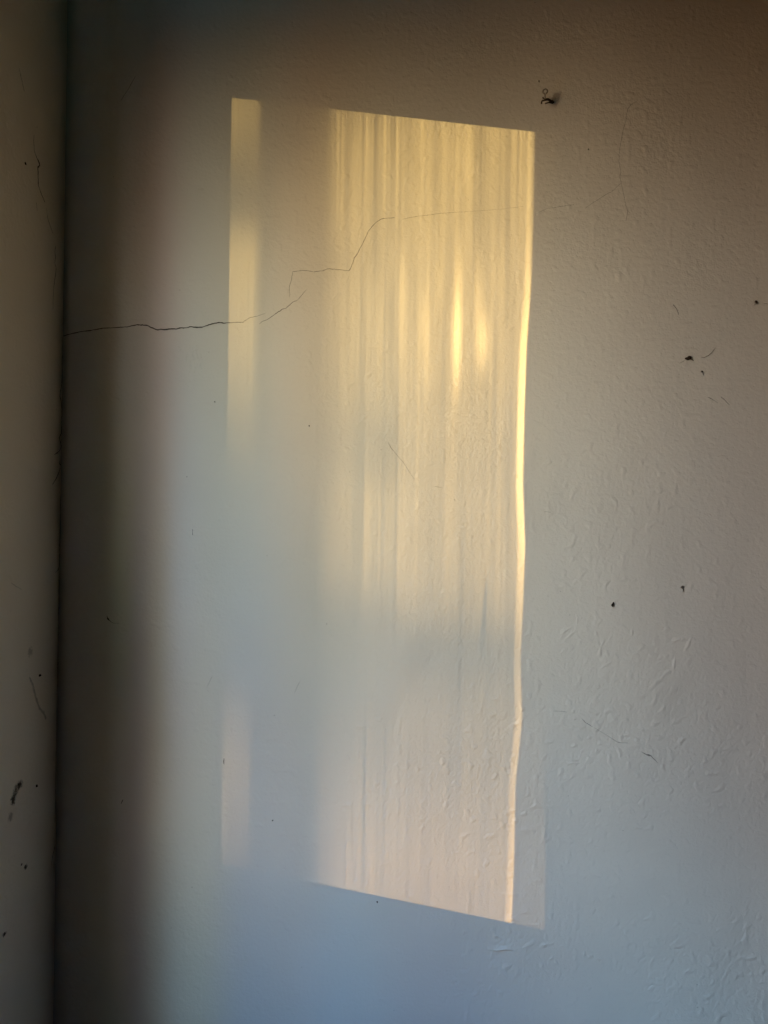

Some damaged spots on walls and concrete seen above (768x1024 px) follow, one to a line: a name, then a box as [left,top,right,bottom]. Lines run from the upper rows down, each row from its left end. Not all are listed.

crack [64,217,394,336]